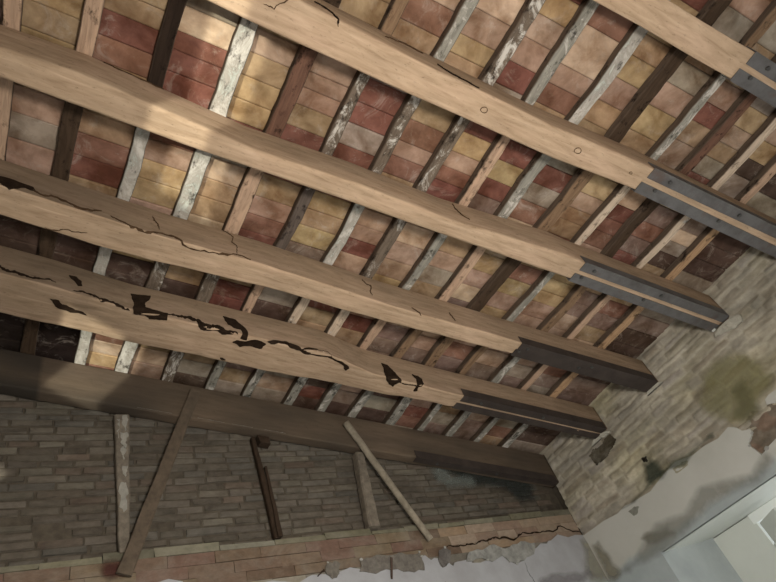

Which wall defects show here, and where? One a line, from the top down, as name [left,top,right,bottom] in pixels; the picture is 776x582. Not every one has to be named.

crack [385,36,479,88]
crack [33,189,251,260]
crack [0,265,55,282]
crack [73,290,130,311]
crack [168,313,238,335]
flaking render [738,404,776,454]
crack [446,525,582,548]
flaking render [325,561,340,579]
flaking render [359,551,425,574]
flaking render [466,541,535,565]